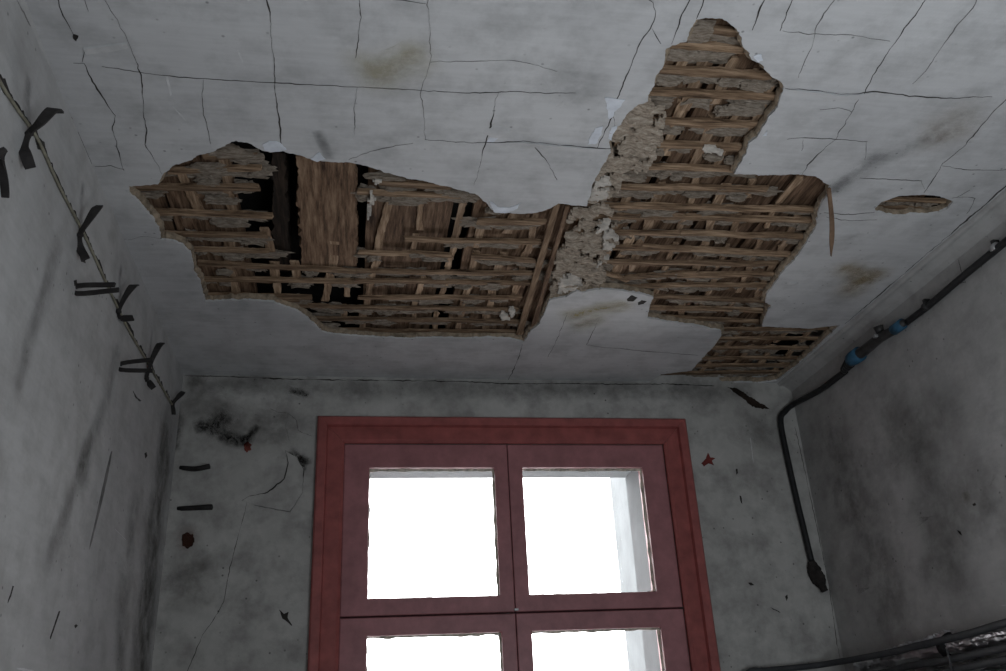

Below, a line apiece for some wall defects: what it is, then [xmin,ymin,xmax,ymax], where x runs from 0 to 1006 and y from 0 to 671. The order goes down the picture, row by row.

crack [58,0,704,183]
flaking render [129,47,724,342]
flaking render [730,27,783,172]
flaking render [760,184,829,325]
crack [780,0,1006,324]
flaking render [875,199,952,214]
flaking render [719,325,838,409]